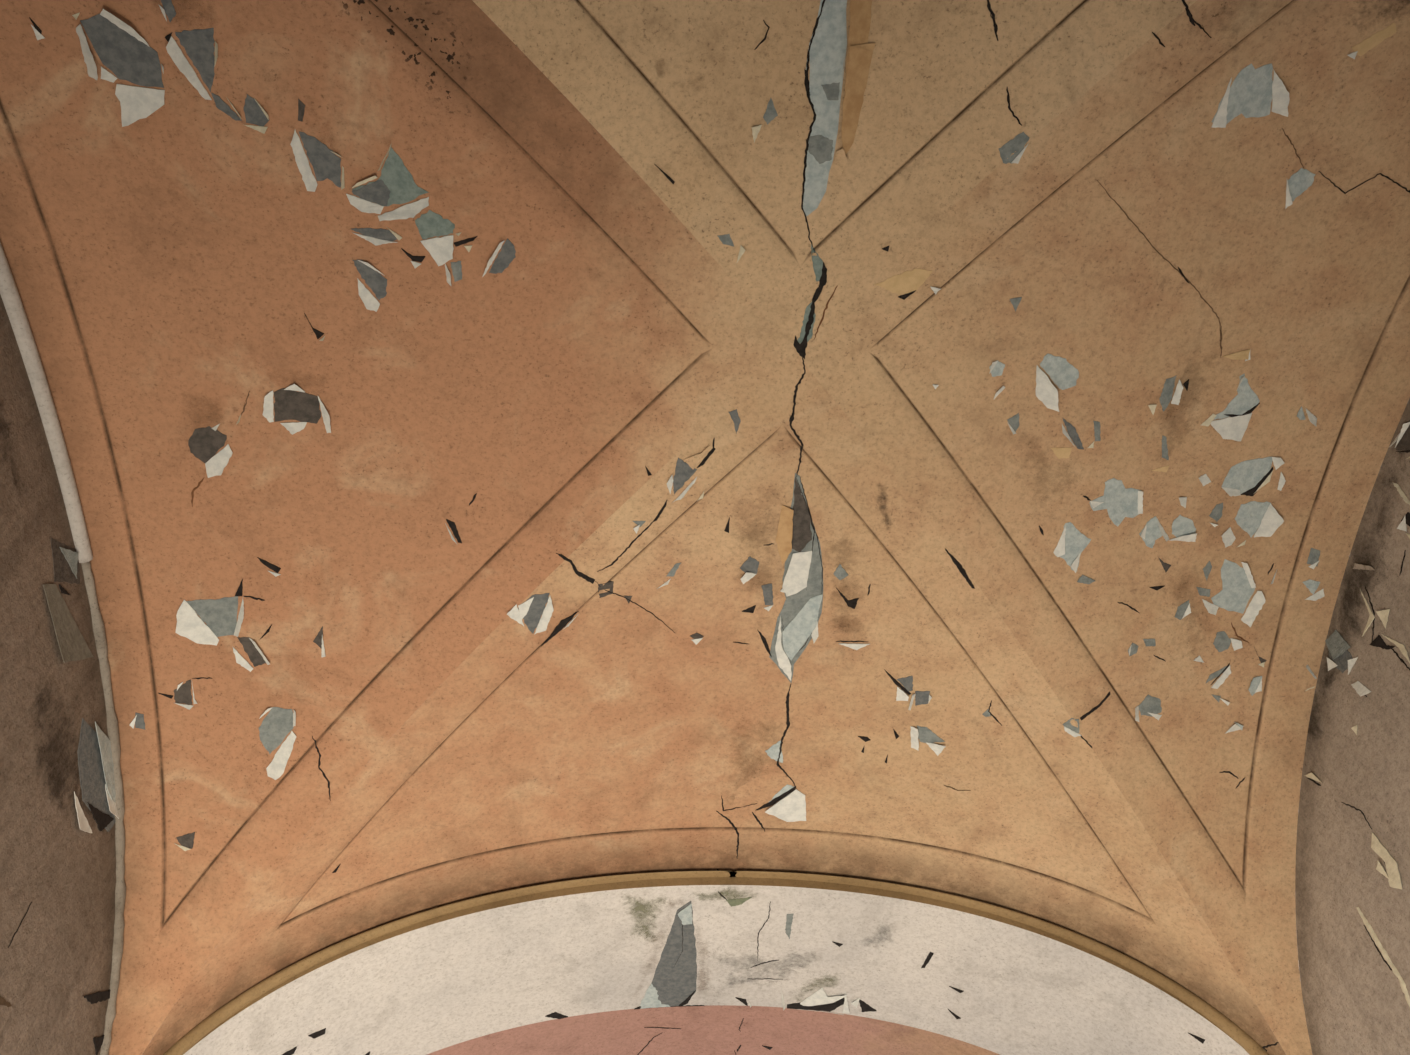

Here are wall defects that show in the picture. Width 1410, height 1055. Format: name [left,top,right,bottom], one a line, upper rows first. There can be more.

peeling [72,0,269,134]
damp [342,0,460,99]
crack [987,0,998,41]
crack [1006,87,1022,126]
peeling [290,98,478,286]
peeling [188,384,331,507]
crack [716,0,876,980]
peeling [1035,354,1101,459]
peeling [175,579,272,672]
peeling [1083,457,1286,705]
peeling [258,707,297,780]
peeling [635,901,705,1009]